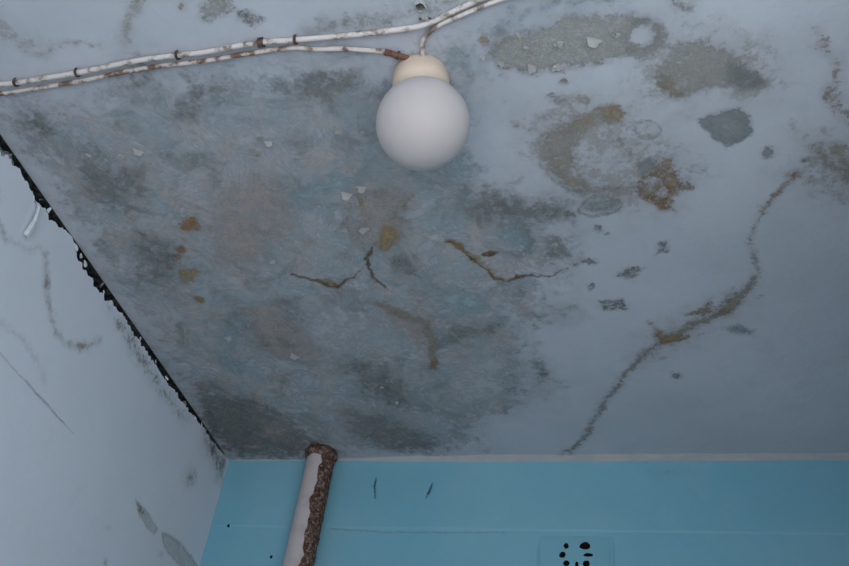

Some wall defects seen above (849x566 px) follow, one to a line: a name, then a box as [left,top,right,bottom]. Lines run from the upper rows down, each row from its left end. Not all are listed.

peeling [479,15,765,97]
leakage [541,97,629,193]
crack [0,135,224,454]
leakage [15,71,575,459]
crack [447,239,562,282]